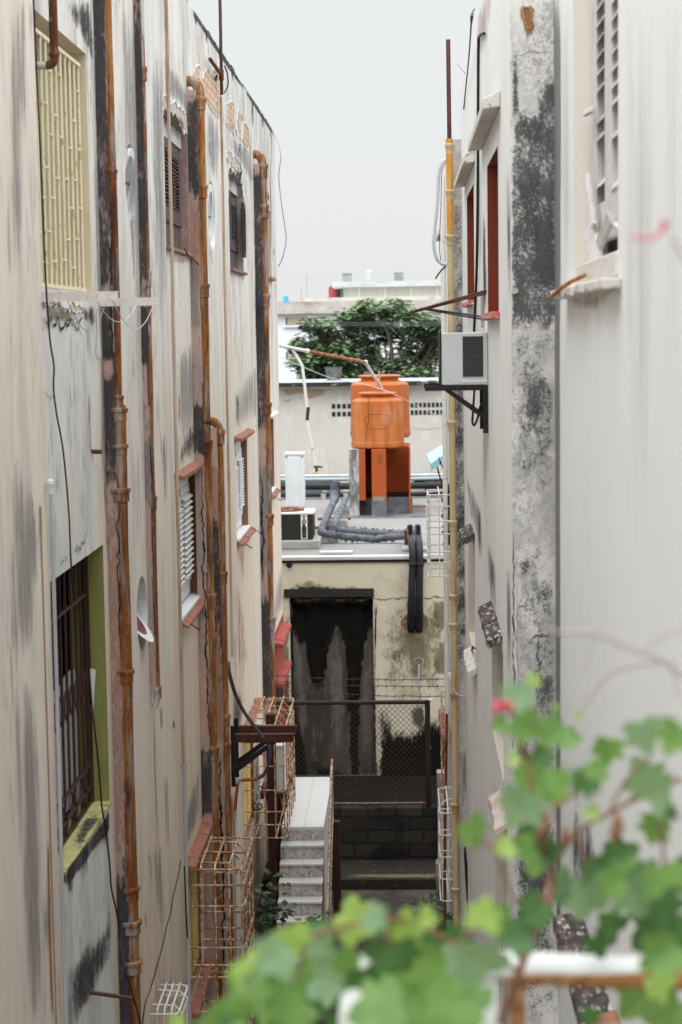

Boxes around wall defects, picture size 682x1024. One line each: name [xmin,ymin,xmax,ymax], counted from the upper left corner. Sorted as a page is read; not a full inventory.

leakage [70,0,111,291]
leakage [123,0,217,365]
spalling [193,64,249,171]
rust [520,6,534,37]
leakage [233,140,266,429]
leakage [85,306,117,506]
leakage [144,437,167,506]
leakage [178,353,205,459]
leakage [259,469,268,569]
leakage [64,506,131,1024]
leakage [187,750,212,840]
leakage [261,580,444,776]